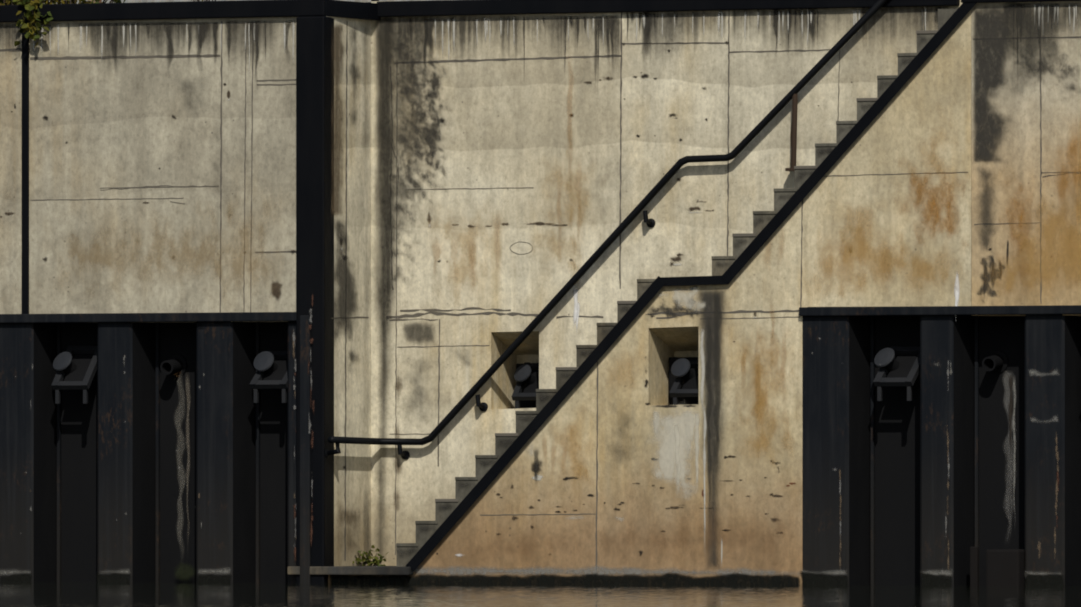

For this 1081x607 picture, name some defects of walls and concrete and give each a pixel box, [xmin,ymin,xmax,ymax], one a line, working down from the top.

water stain [33,21,294,67]
water stain [377,9,836,406]
water stain [853,6,948,31]
rust [913,179,952,231]
water stain [975,3,1081,296]
water stain [415,288,774,575]